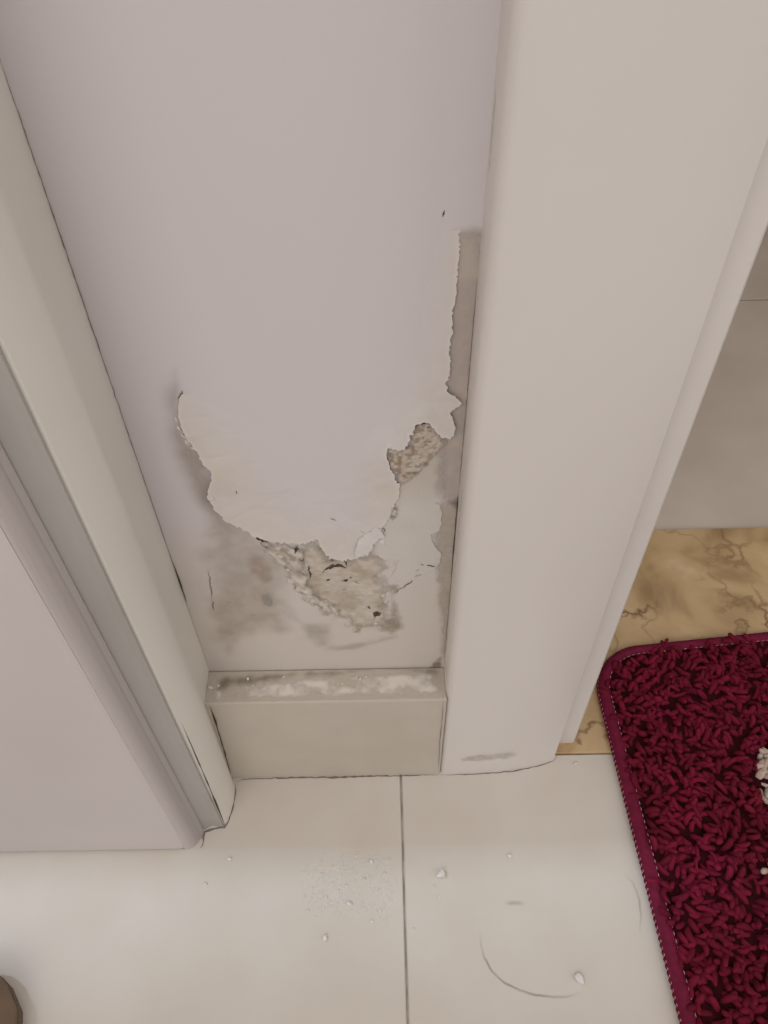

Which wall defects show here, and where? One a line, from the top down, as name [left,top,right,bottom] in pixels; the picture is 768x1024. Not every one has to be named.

peeling [174,225,462,632]